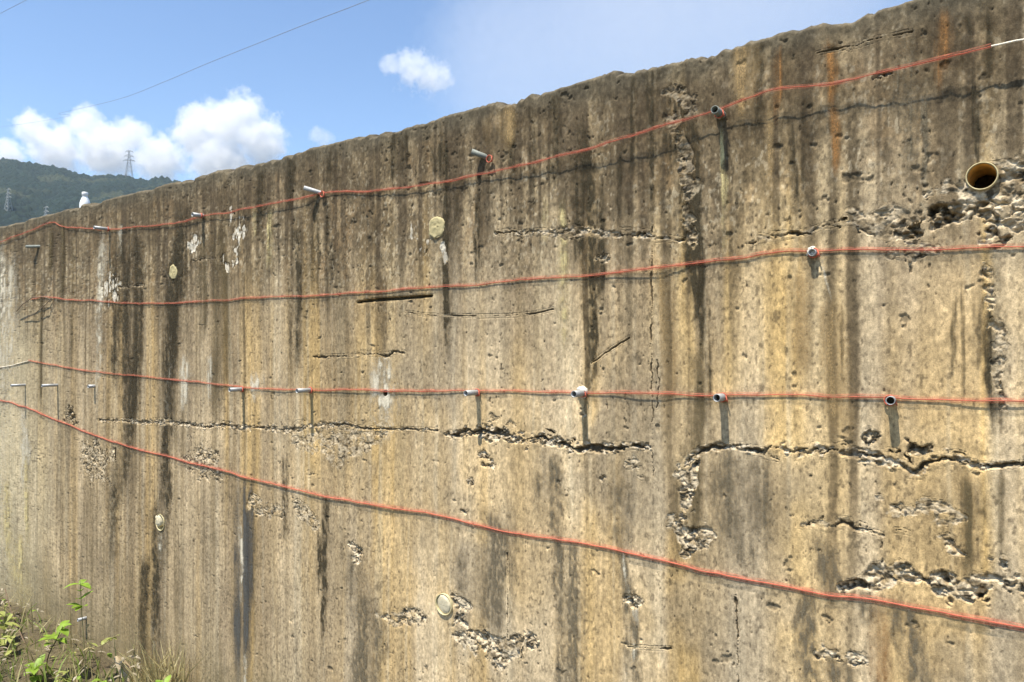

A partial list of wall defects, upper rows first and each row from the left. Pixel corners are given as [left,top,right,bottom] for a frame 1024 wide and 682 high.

spalling [659,82,702,250]
rust [827,47,839,168]
spalling [834,141,1024,412]
damp [97,229,143,544]
damp [138,214,188,656]
spalling [374,605,428,629]
spalling [446,590,542,674]
crack [98,223,1024,484]
spalling [664,453,718,561]
spalling [873,493,968,559]
spalling [903,437,951,457]
spalling [835,554,1024,609]